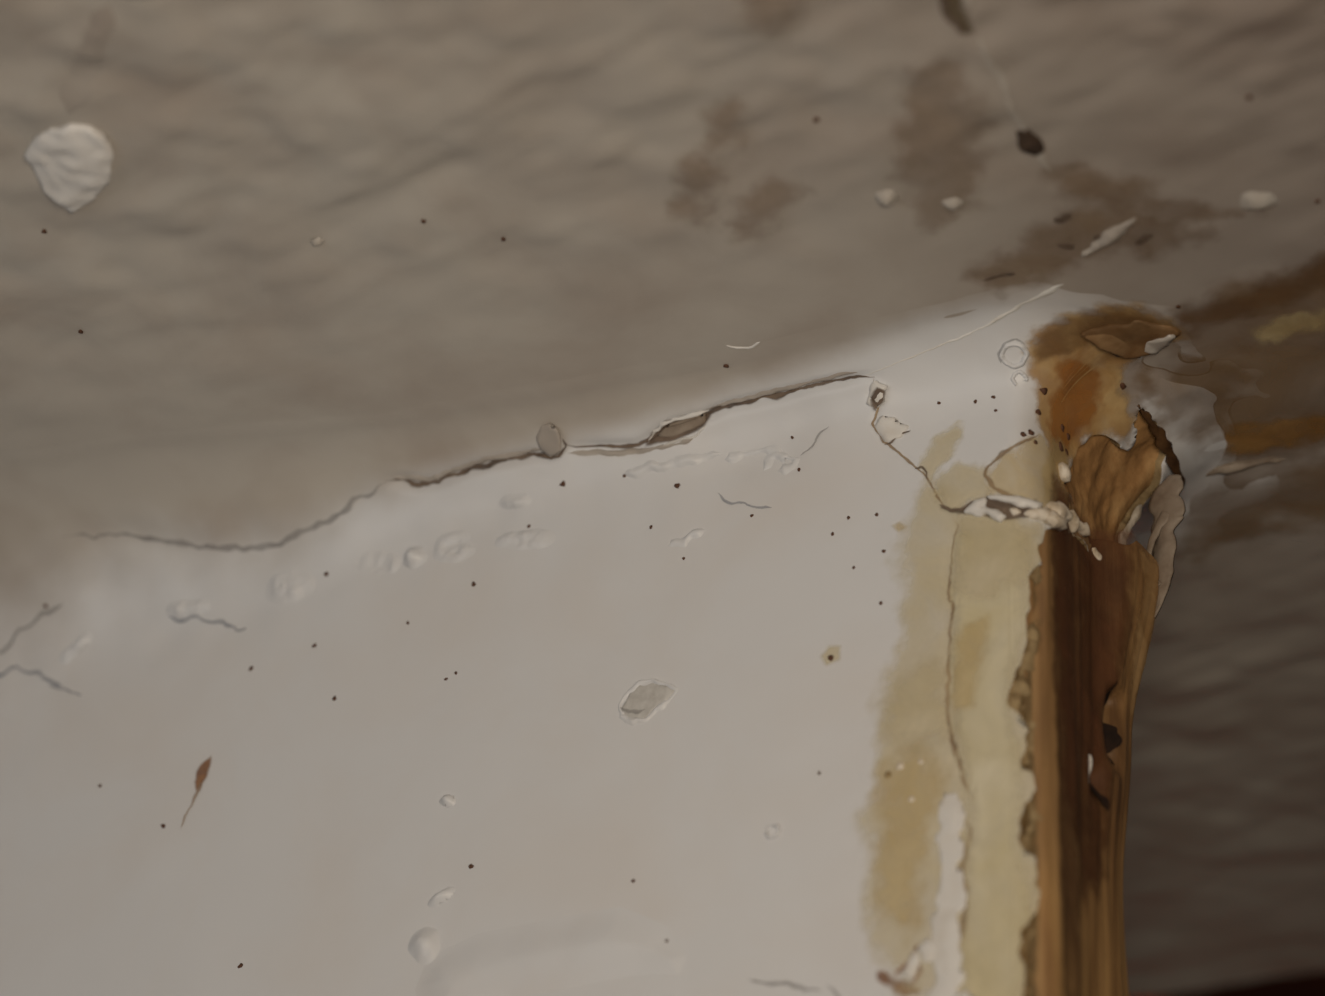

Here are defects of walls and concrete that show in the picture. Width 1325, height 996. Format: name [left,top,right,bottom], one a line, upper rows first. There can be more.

damp [1054,213,1153,258]
peeling [1081,320,1181,359]
damp [1178,268,1325,453]
spalling [939,405,1186,619]
crack [388,372,972,943]
damp [867,489,1041,996]
spalling [1008,606,1040,766]